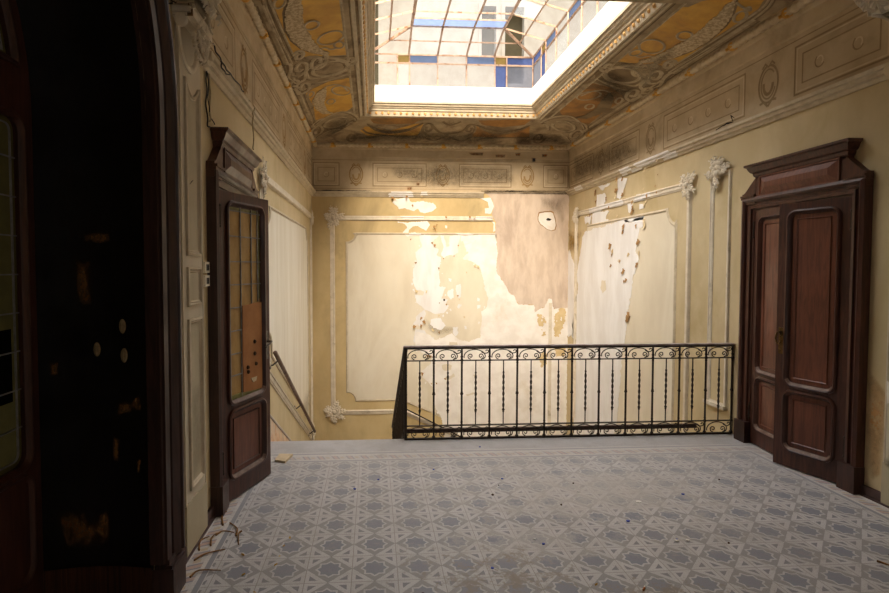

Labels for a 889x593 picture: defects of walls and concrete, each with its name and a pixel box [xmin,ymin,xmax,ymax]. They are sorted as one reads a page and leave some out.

peeling [388,150,678,437]